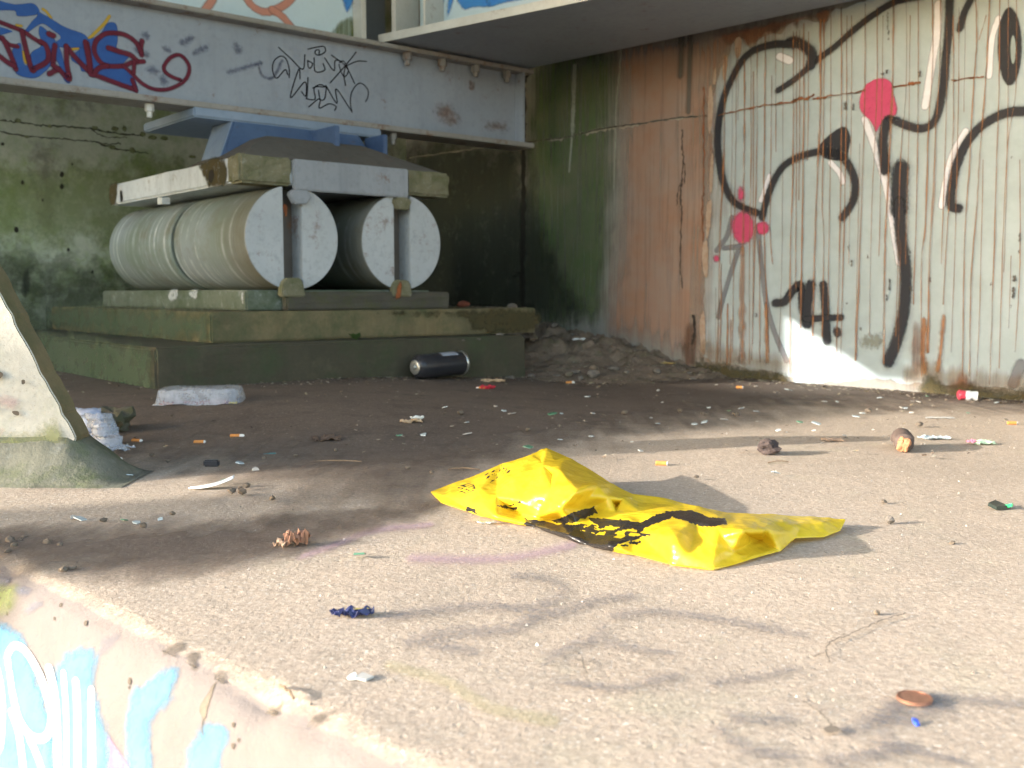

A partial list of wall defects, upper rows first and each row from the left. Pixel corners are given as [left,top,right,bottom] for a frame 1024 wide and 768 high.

crack [0,118,168,154]
rust [109,182,123,205]
rust [199,157,227,187]
damp [568,64,577,173]
crack [519,68,865,308]
rust [610,0,1020,388]
damp [0,256,143,329]